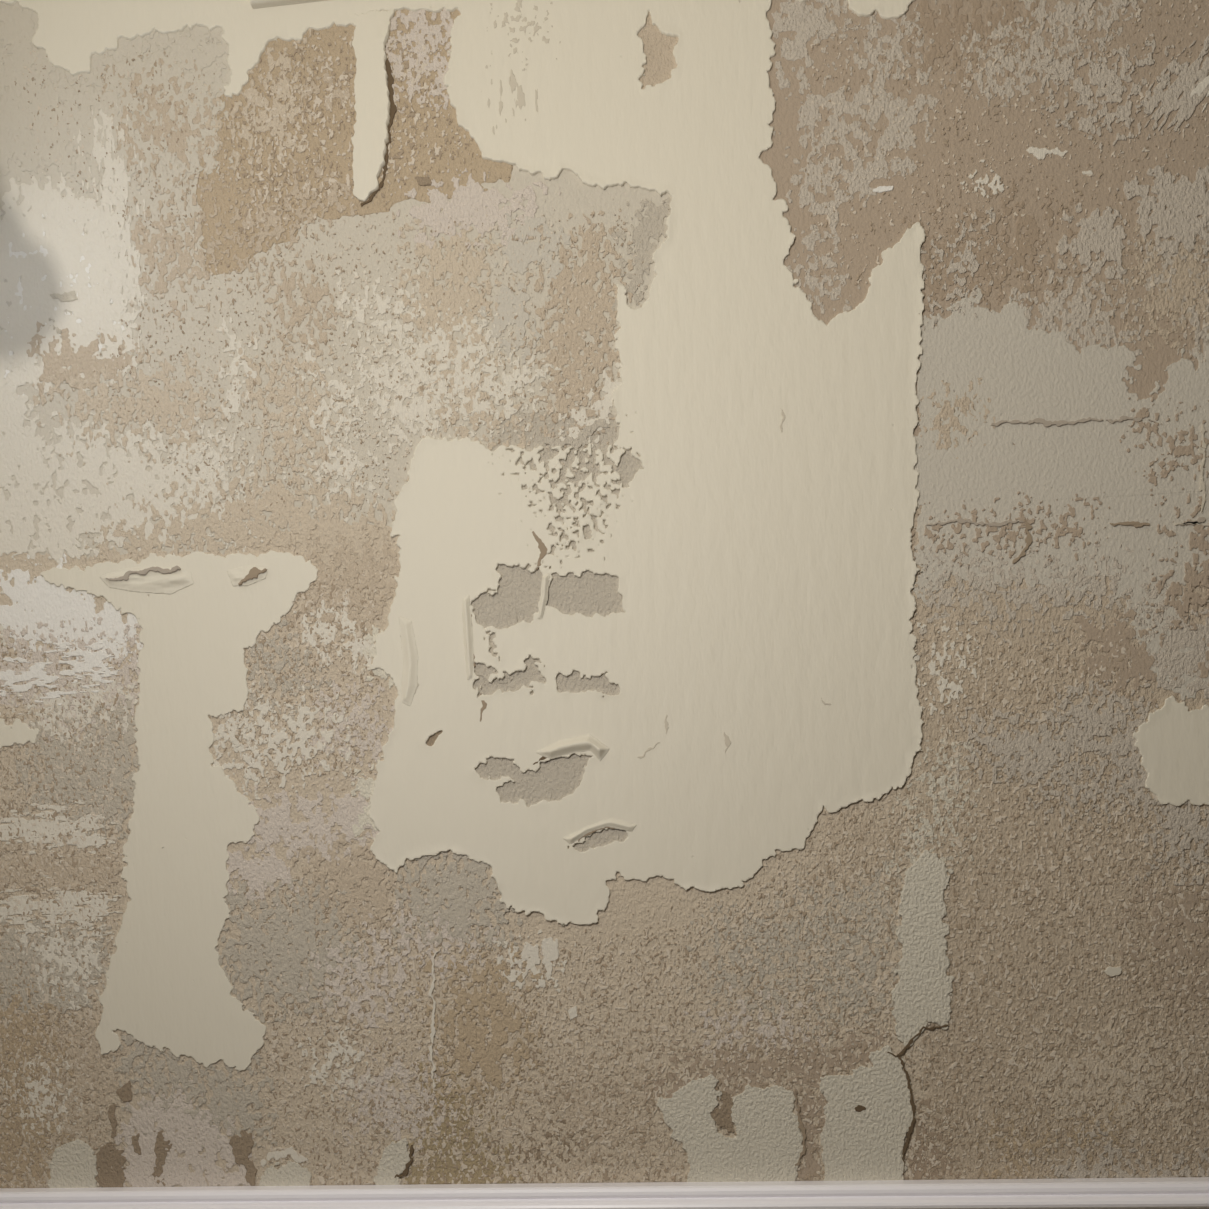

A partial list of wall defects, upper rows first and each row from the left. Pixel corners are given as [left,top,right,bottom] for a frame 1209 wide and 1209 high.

peeling [638,12,679,89]
peeling [0,142,105,220]
spalling [48,291,78,354]
peeling [759,0,1209,635]
peeling [66,587,107,614]
peeling [471,561,625,697]
peeling [0,624,111,724]
peeling [426,731,443,746]
peeling [475,754,592,807]
peeling [568,828,628,852]
crack [887,1024,949,1175]
spalling [152,1121,186,1187]